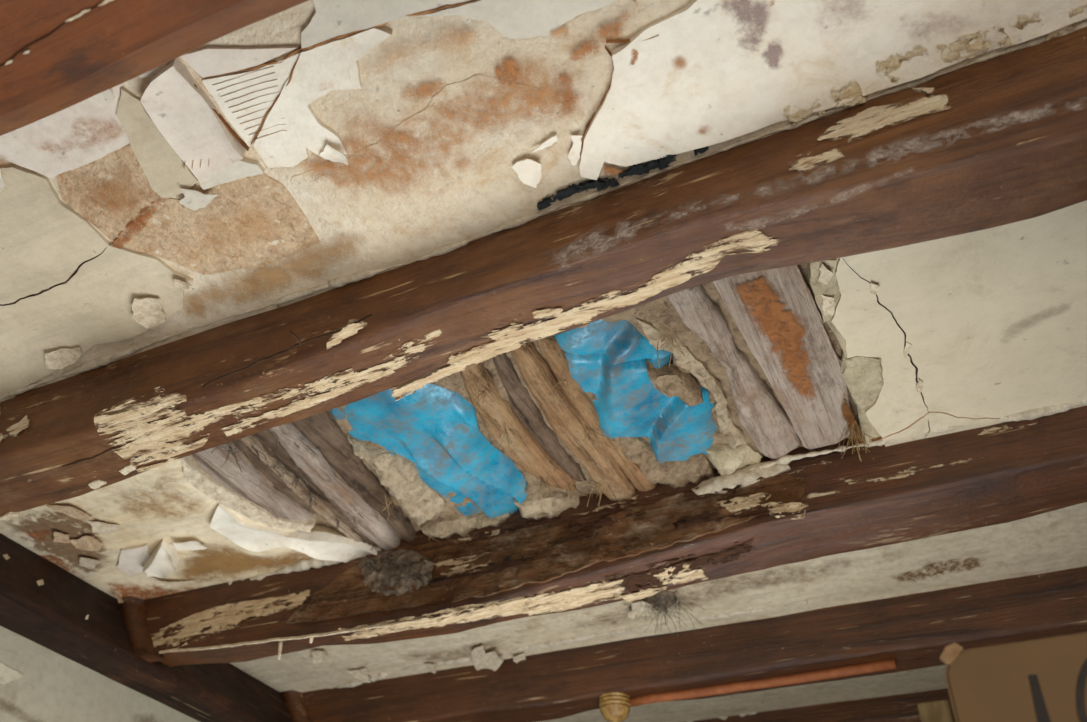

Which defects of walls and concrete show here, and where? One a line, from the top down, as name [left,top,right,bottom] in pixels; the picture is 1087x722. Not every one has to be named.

crack [0,0,113,67]
damp [725,0,782,67]
peeling [0,0,1087,416]
crack [0,196,160,306]
crack [843,259,1000,442]
peeling [94,207,814,563]
peeling [0,415,30,441]
peeling [807,459,970,498]
spalling [0,505,119,572]
peeling [117,540,207,589]
peeling [151,561,709,664]
peeling [471,646,526,671]